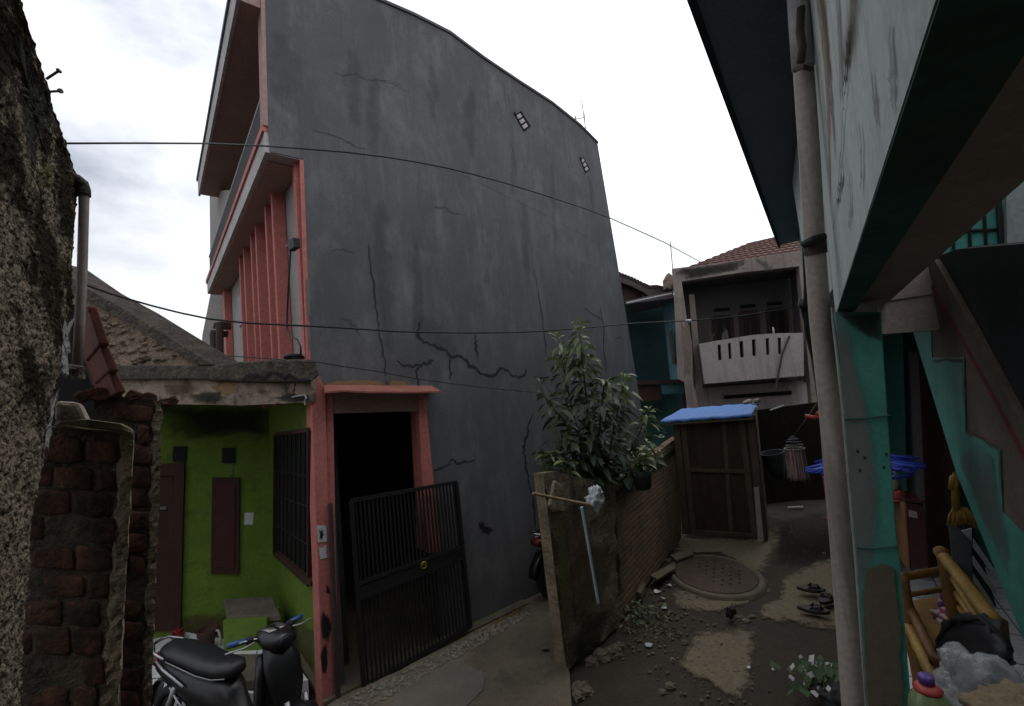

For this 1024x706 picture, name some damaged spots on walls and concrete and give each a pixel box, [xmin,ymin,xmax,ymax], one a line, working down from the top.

water stain [816,0,842,203]
crack [368,245,560,386]
crack [522,415,536,528]